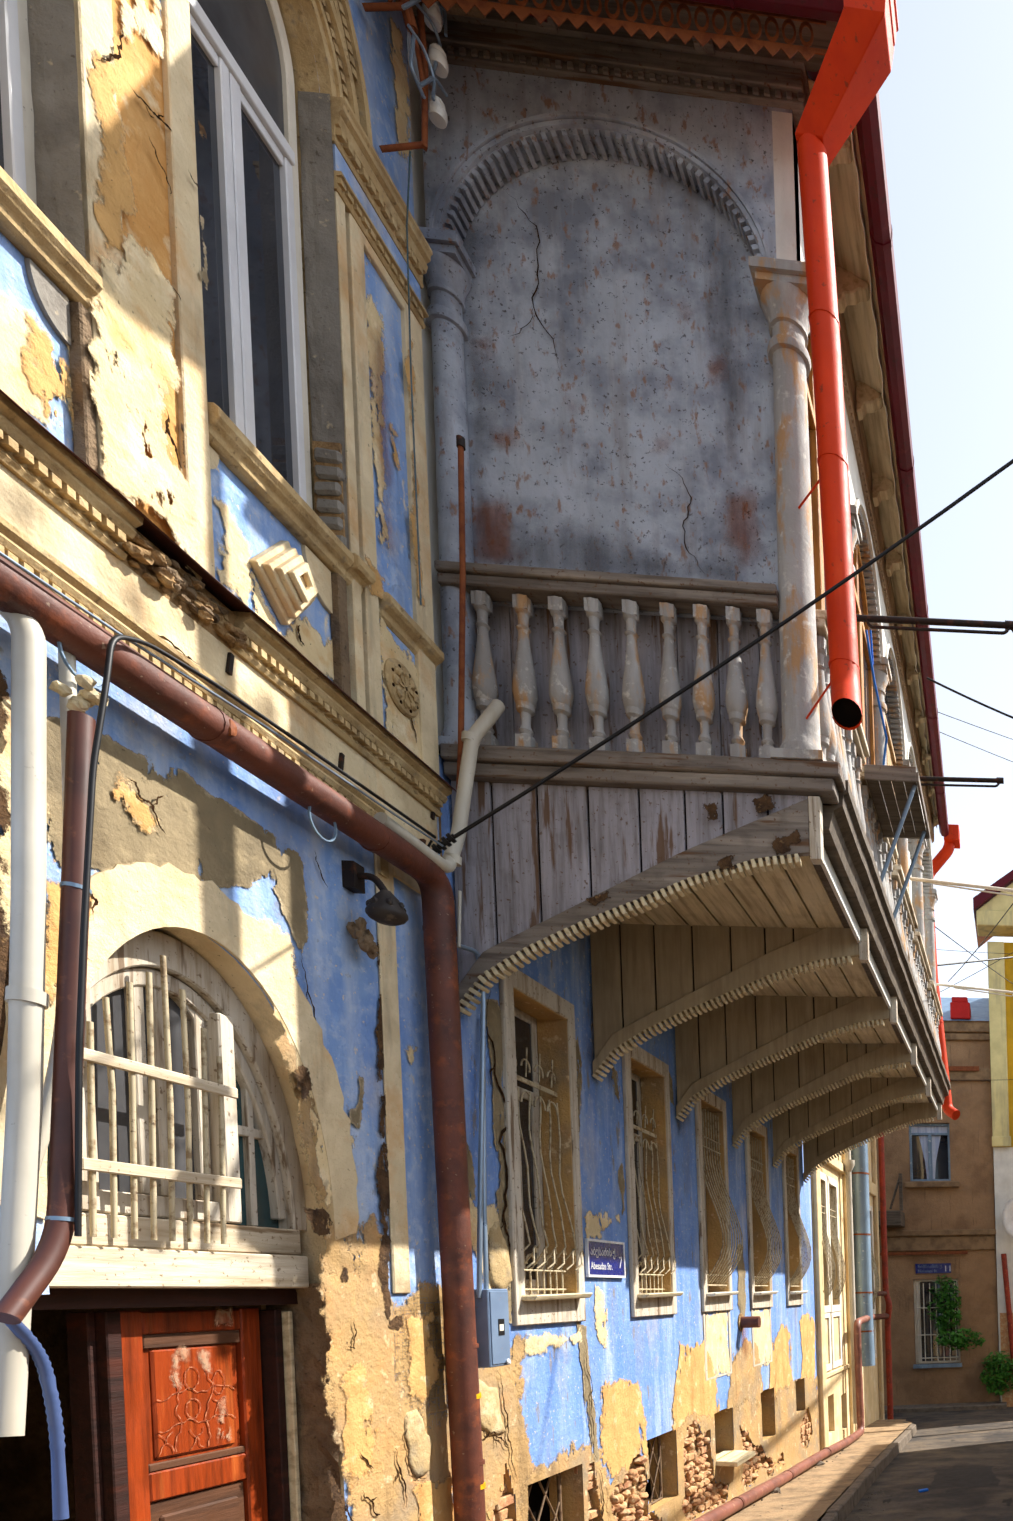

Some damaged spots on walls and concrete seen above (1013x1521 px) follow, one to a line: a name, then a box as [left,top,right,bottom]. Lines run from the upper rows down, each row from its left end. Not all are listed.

peeling [0,0,334,680]
peeling [365,293,425,759]
crack [508,194,561,372]
peeling [45,716,63,1005]
peeling [91,734,308,977]
peeling [273,940,454,1521]
peeling [467,999,820,1521]